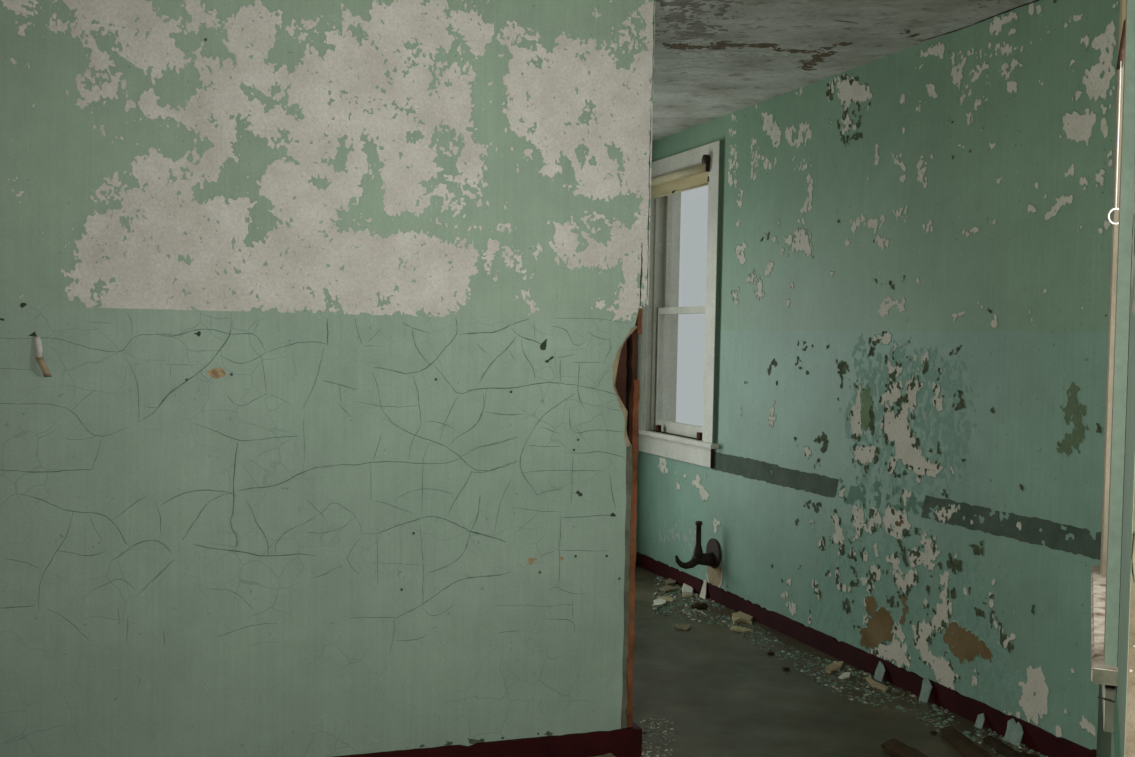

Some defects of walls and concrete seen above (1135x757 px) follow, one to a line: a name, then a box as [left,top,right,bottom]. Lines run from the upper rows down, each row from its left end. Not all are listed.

peeling [1,0,814,447]
damp [655,0,746,40]
peeling [826,71,873,147]
peeling [837,206,908,250]
peeling [874,143,933,188]
peeling [900,83,938,112]
peeling [915,0,1057,150]
peeling [1027,0,1118,222]
crack [0,0,655,654]
peeling [658,457,709,502]
peeling [781,275,1097,746]
flaking render [1125,479,1135,757]